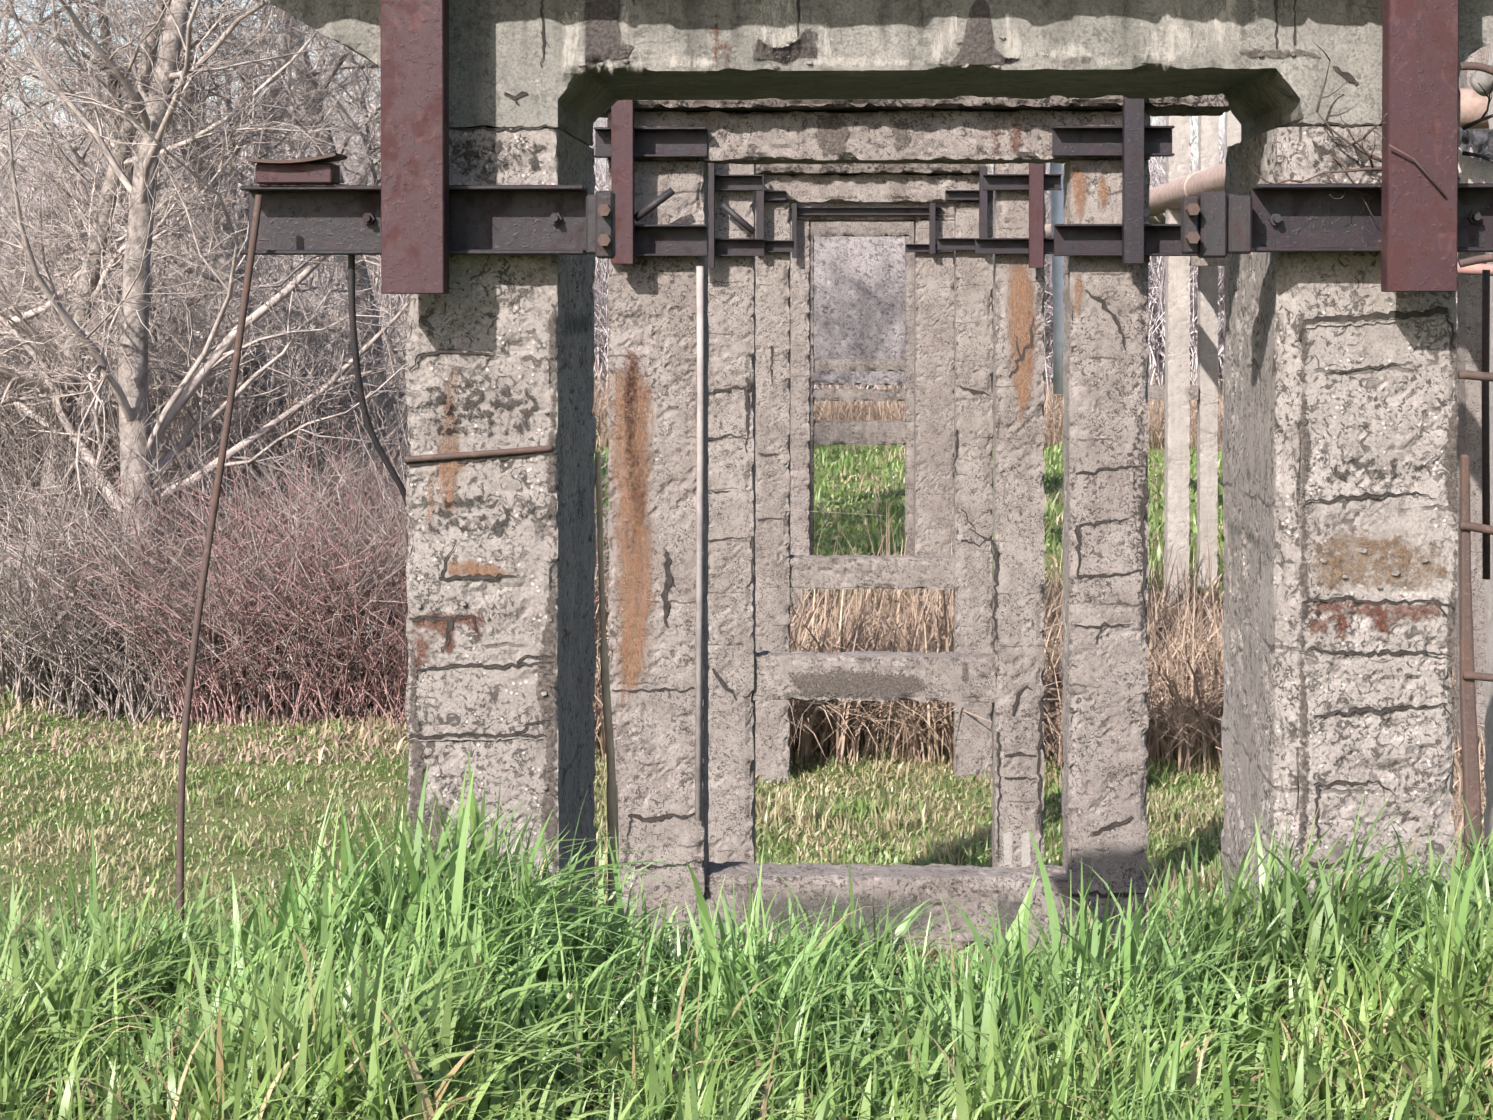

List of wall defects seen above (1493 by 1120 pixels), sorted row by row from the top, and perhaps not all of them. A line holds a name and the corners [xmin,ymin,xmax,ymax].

water stain [562,11,613,69]
water stain [632,55,713,70]
crack [1273,0,1296,49]
crack [1332,66,1359,85]
crack [1305,122,1375,149]
corrosion [1006,266,1034,415]
crack [1085,289,1126,350]
corrosion [613,349,653,697]
corrosion [450,561,501,575]
corrosion [1307,601,1440,638]